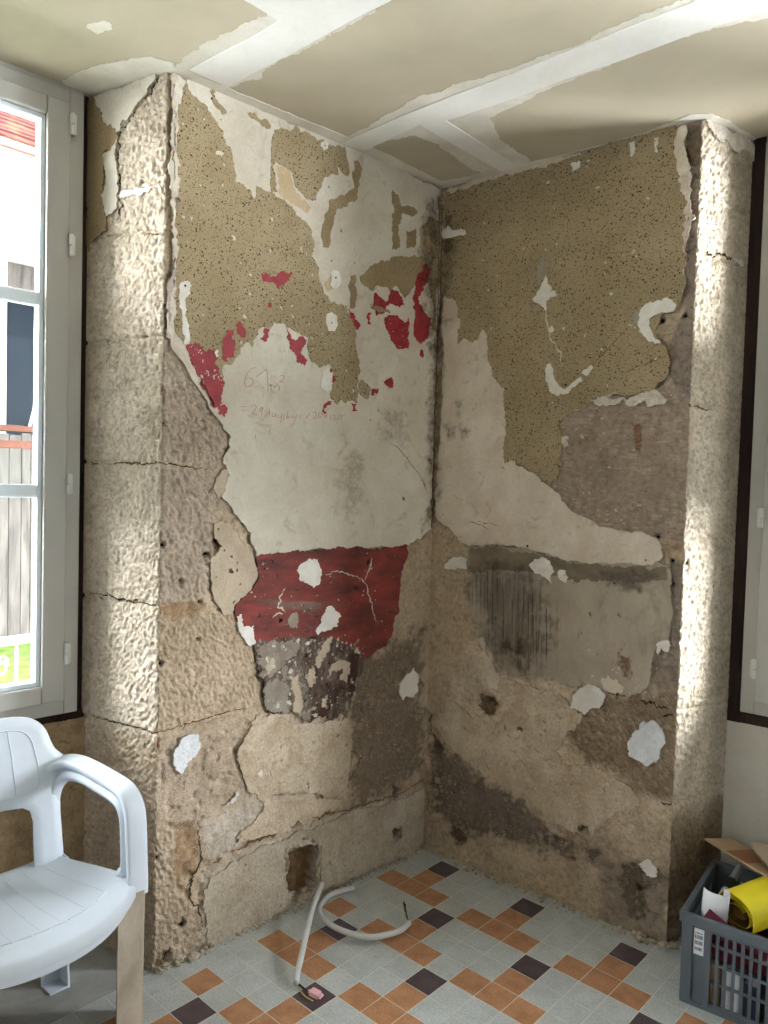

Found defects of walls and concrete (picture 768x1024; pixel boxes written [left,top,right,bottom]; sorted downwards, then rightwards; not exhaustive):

flaking render [705,119,755,161]
peeling [86,74,156,252]
crack [705,251,732,260]
crack [92,461,208,470]
flaking render [166,72,696,946]
crack [91,593,158,609]
crack [325,559,375,619]
crack [92,708,244,734]
crack [187,778,429,927]